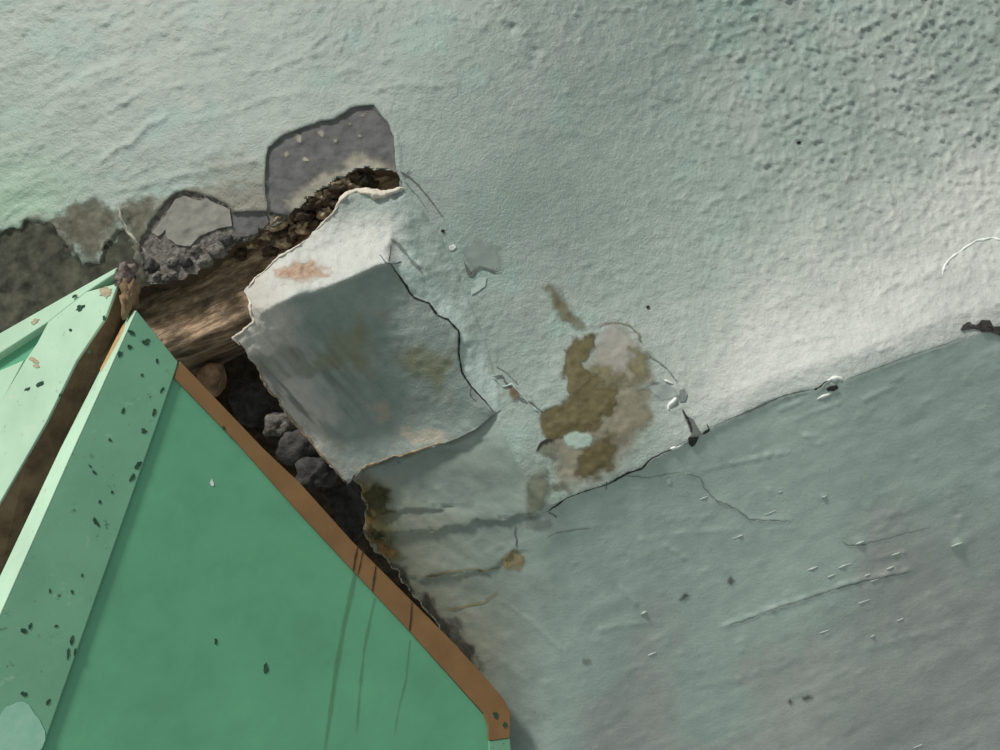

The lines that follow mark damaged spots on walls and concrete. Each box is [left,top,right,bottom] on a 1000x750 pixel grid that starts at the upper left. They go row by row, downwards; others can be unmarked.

flaking render [118,105,402,284]
crack [380,247,545,417]
damp [527,287,650,529]
crack [636,352,677,391]
crack [713,389,813,427]
crack [846,339,957,380]
crack [547,444,785,538]